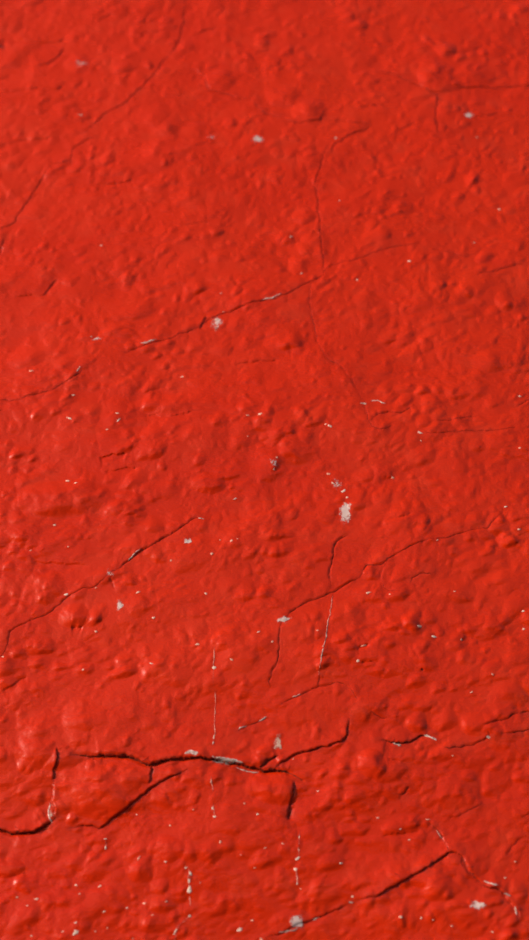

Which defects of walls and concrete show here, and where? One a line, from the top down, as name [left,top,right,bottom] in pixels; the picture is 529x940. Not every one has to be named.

crack [0,518,529,835]
crack [271,803,528,935]